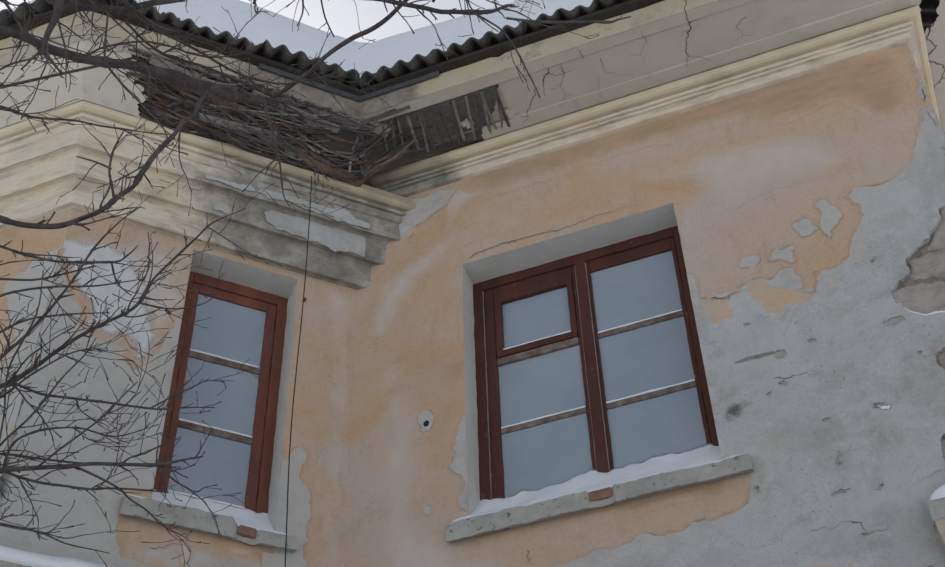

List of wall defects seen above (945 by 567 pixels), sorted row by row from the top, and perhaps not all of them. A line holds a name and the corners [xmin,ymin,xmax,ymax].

crack [493,31,647,129]
crack [684,0,710,68]
crack [922,20,945,124]
peeling [205,175,370,257]
peeling [399,188,458,239]
peeling [505,48,945,567]
peeling [0,239,312,567]